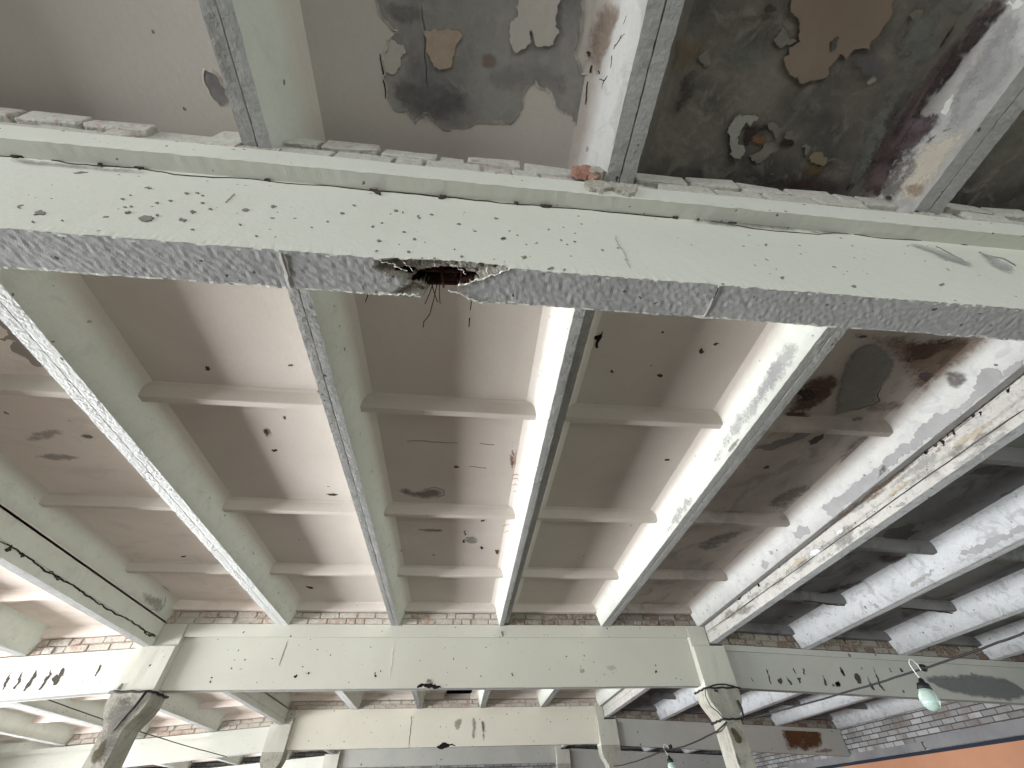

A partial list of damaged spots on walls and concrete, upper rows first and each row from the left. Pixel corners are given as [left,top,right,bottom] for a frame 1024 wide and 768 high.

peeling [201,67,229,106]
peeling [375,0,616,131]
peeling [774,0,894,84]
peeling [727,114,828,174]
hole [120,198,173,222]
spalling [371,222,512,327]
water stain [859,335,962,387]
water stain [786,376,837,417]
peeling [822,360,1023,517]
spalling [2,668,64,691]
spalling [822,667,885,691]
rust [783,730,822,750]